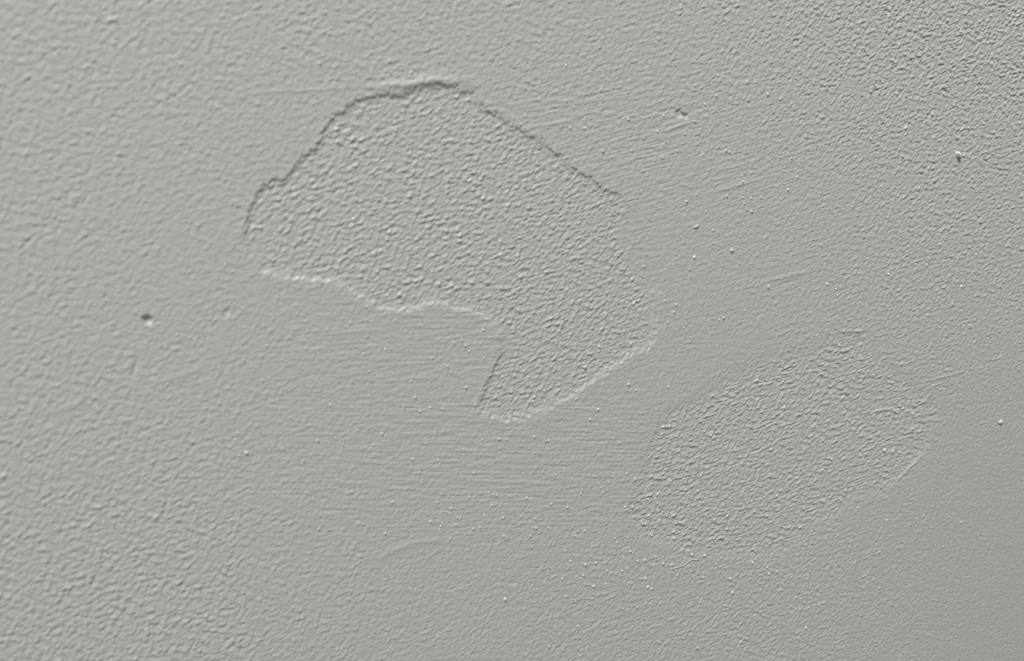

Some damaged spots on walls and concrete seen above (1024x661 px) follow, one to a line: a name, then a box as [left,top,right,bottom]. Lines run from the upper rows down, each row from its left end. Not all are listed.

peeling [237,78,676,428]